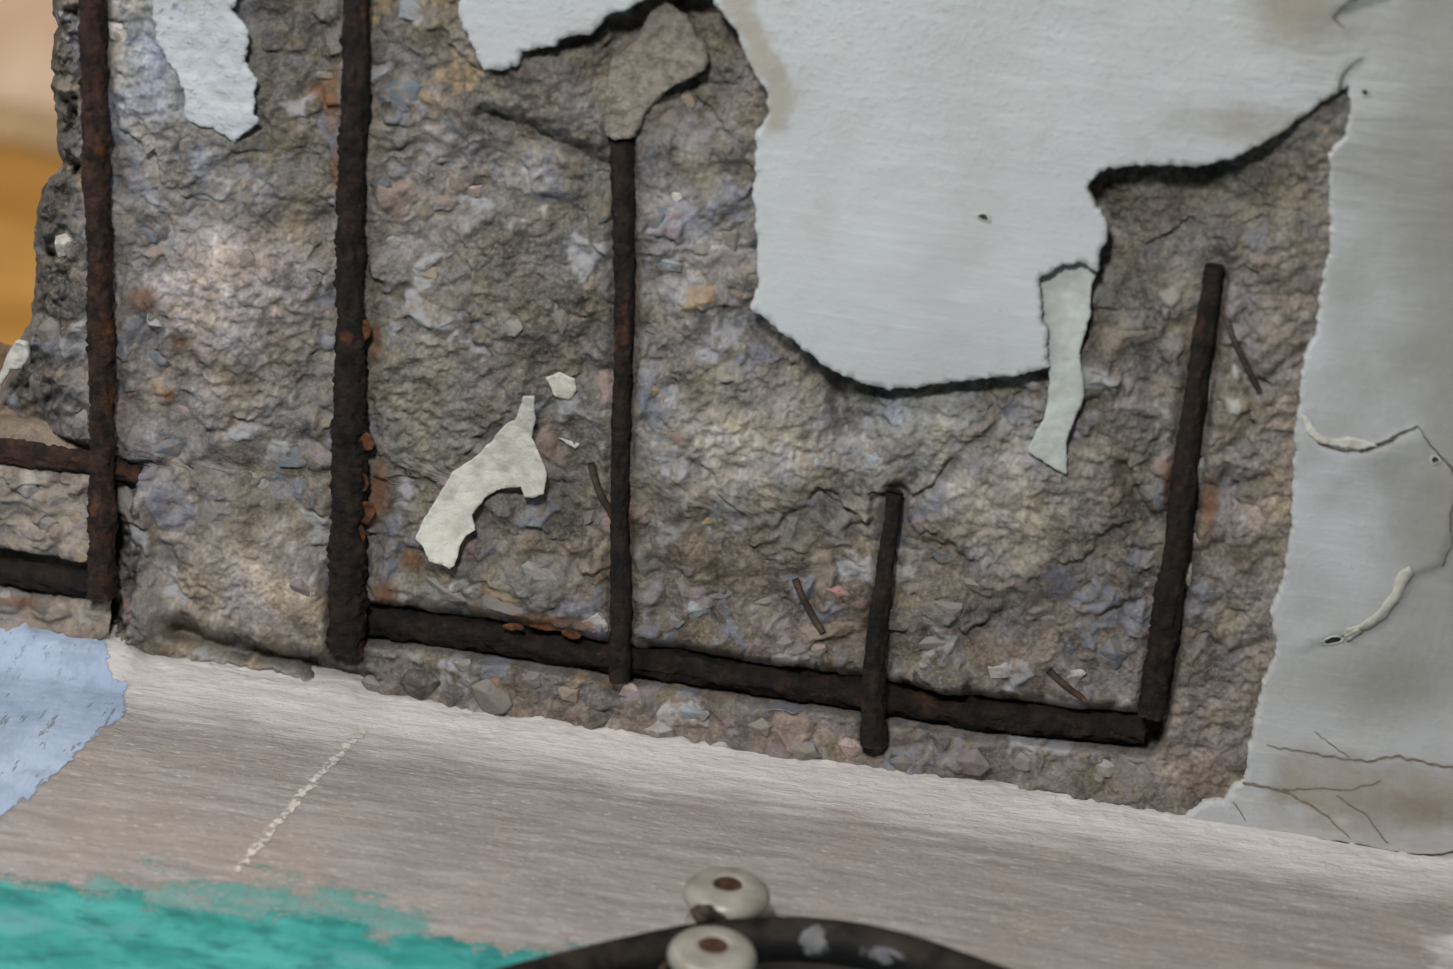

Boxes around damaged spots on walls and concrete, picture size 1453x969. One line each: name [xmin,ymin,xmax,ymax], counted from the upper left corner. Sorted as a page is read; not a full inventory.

crack [1332,0,1361,91]
spalling [0,0,1377,815]
crack [1317,425,1453,567]
crack [1233,731,1453,856]